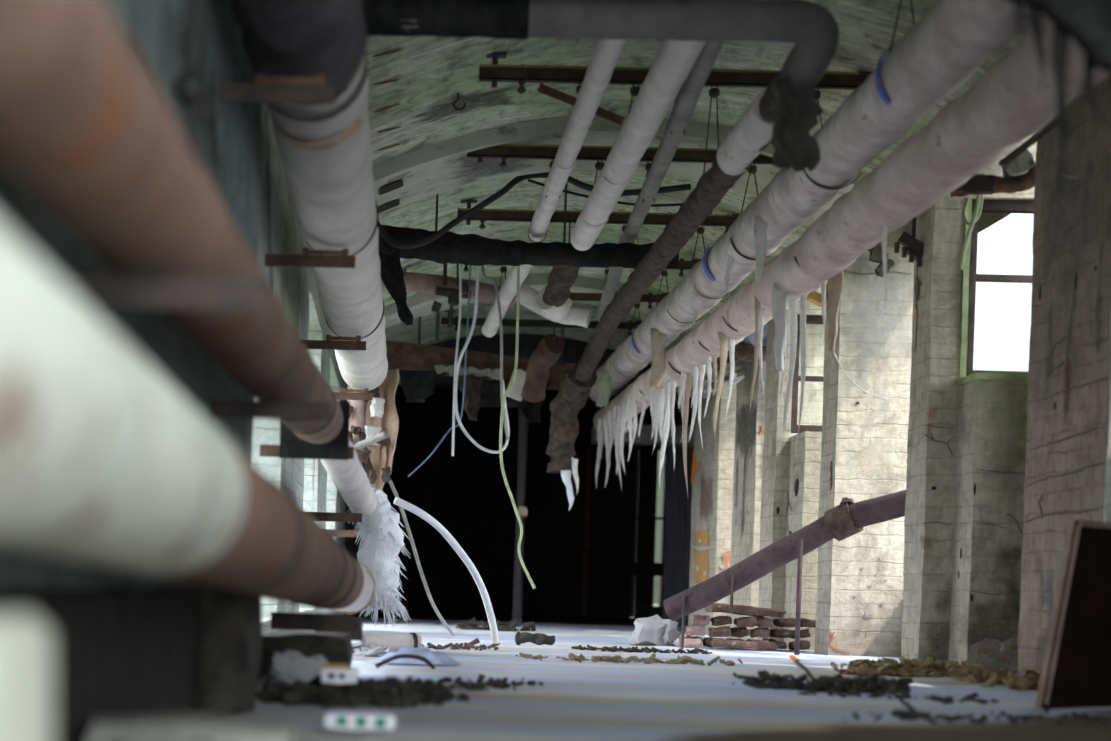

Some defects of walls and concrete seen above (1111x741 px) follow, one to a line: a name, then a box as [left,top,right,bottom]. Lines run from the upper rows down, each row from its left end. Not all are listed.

crack [923,271,1108,534]